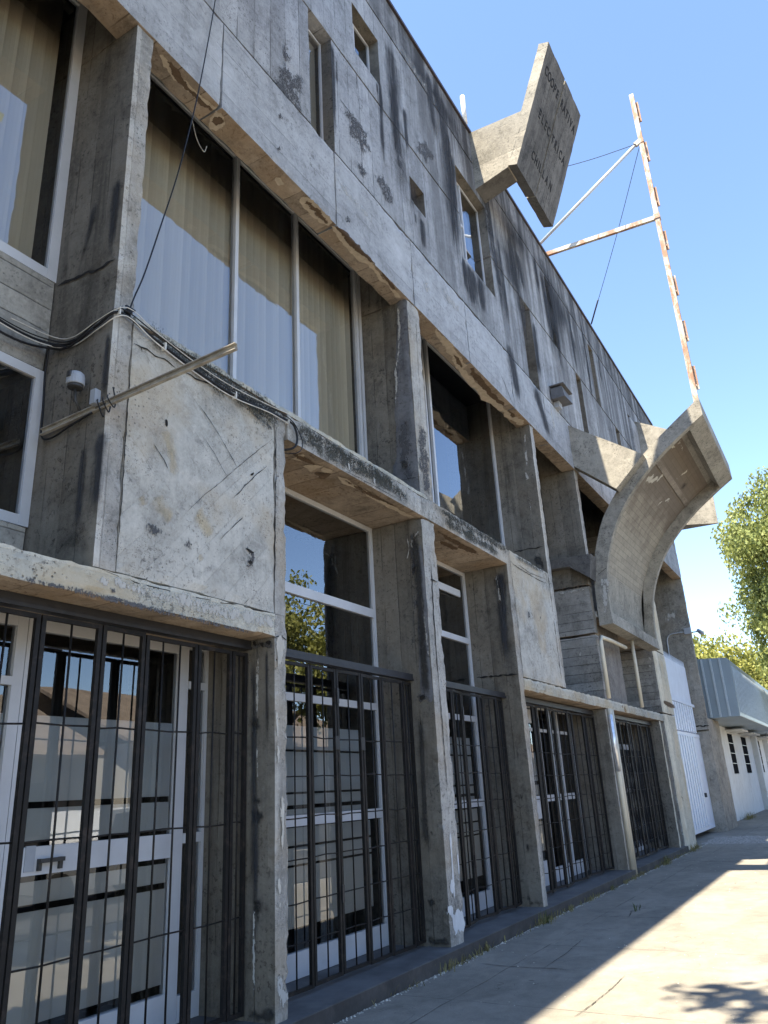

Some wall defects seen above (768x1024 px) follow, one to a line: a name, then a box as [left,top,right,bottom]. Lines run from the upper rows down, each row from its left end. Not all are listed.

peeling [160,54,225,131]
spalling [270,46,303,112]
spalling [346,111,371,178]
water stain [376,49,409,177]
water stain [423,74,459,243]
peeling [299,197,401,399]
water stain [463,259,485,310]
peeling [435,329,529,479]
water stain [480,196,541,371]
water stain [508,347,520,397]
water stain [533,259,602,394]
peeling [448,833,465,935]